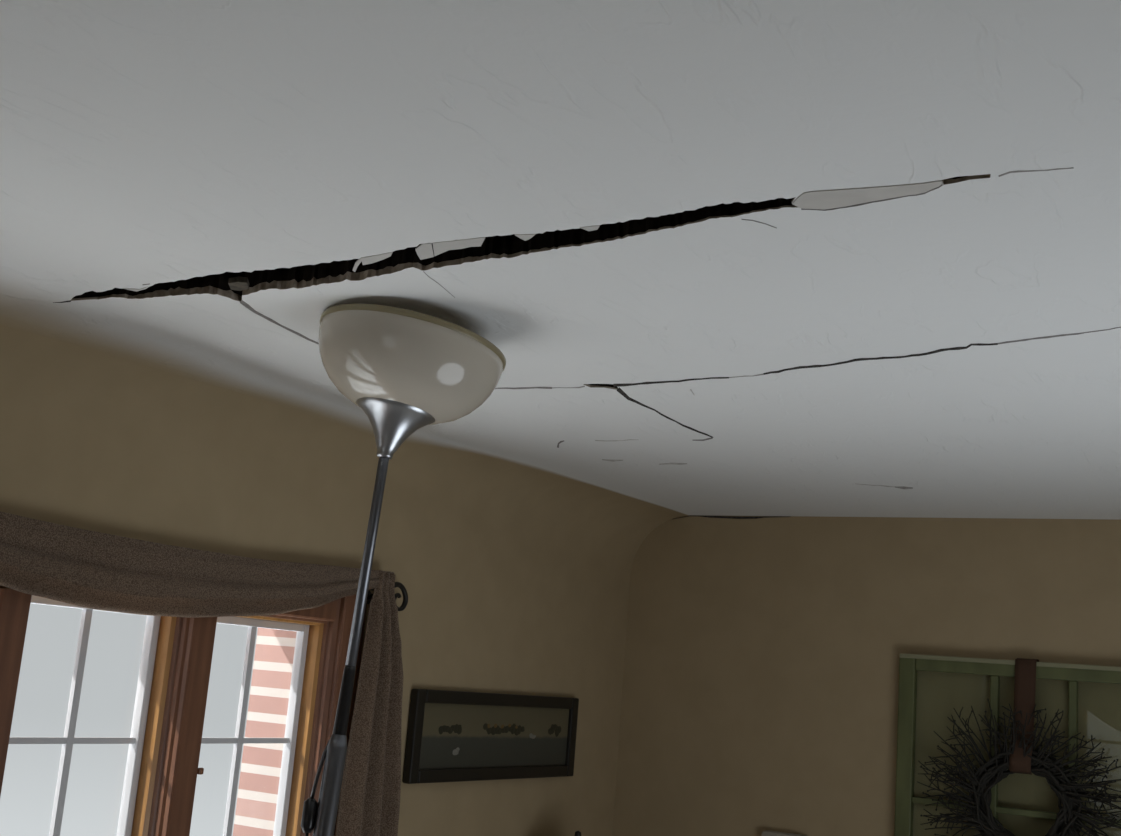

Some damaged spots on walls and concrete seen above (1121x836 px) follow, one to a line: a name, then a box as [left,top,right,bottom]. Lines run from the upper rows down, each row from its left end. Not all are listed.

crack [53,167,1074,345]
crack [495,327,1121,441]